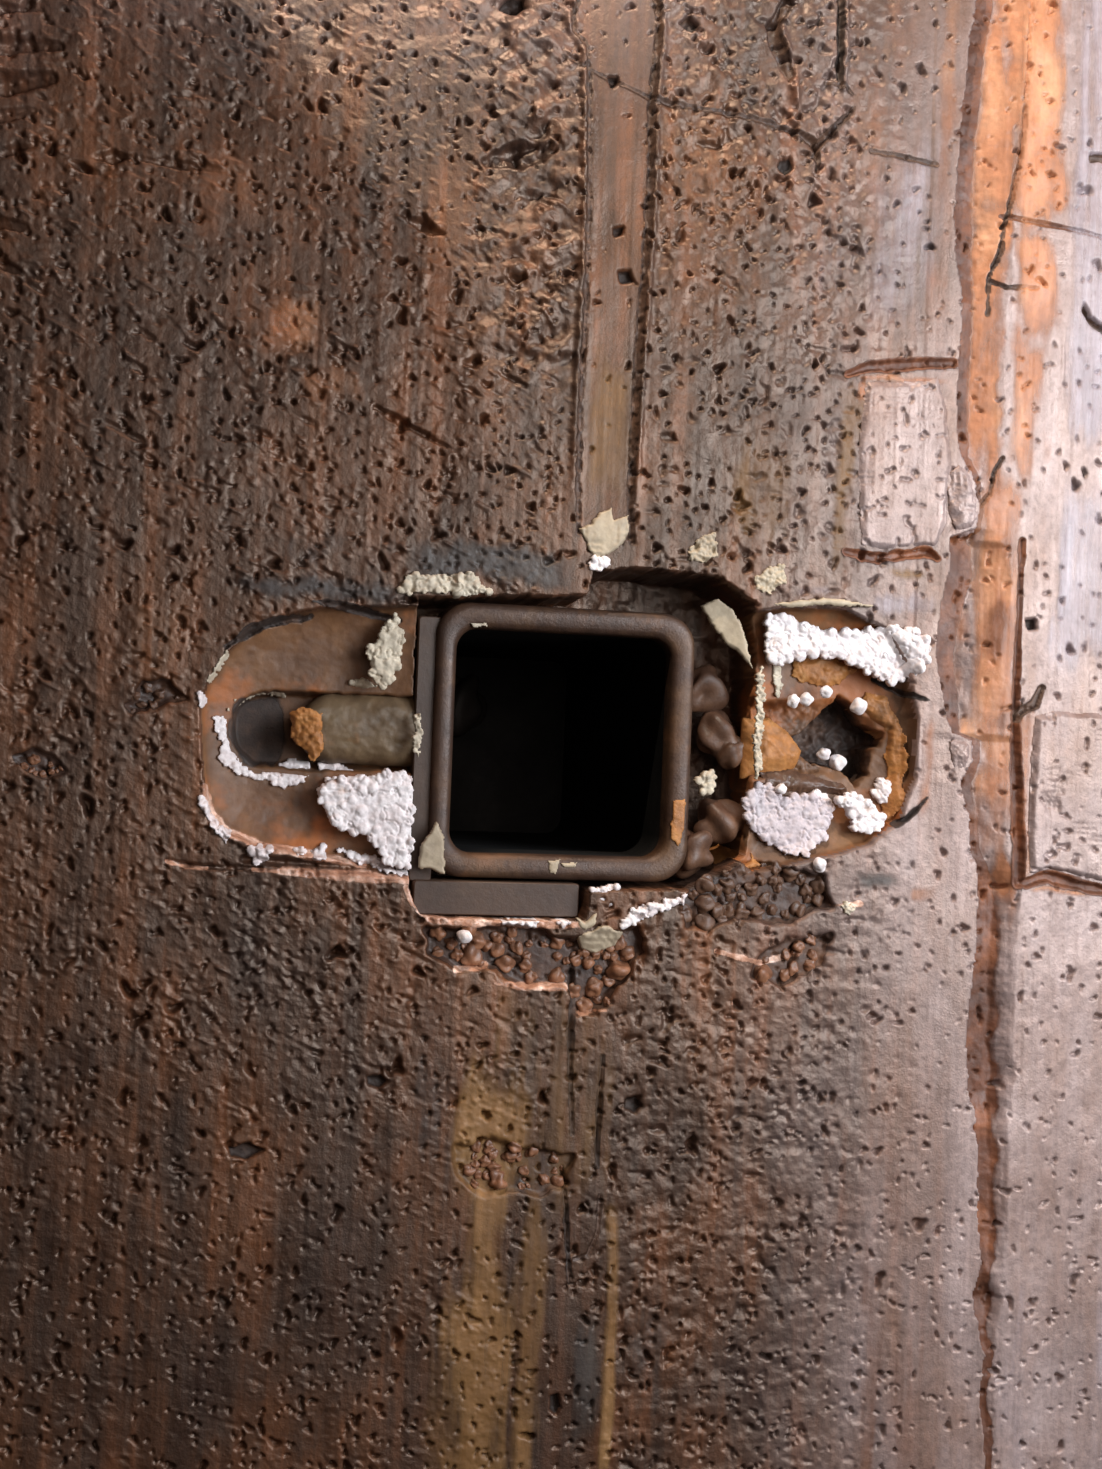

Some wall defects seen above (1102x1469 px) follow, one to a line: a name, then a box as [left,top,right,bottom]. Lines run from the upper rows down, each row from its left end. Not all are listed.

crack [562,0,856,172]
corrosion [976,0,1067,803]
peeling [700,599,753,668]
peeling [775,597,873,608]
corrosion [791,655,857,687]
leakage [201,783,367,868]
peeling [418,822,445,874]
corrosion [759,769,847,796]
corrosion [862,692,910,819]
crack [842,0,1102,1469]
spalling [668,861,833,986]
crack [559,967,605,1284]